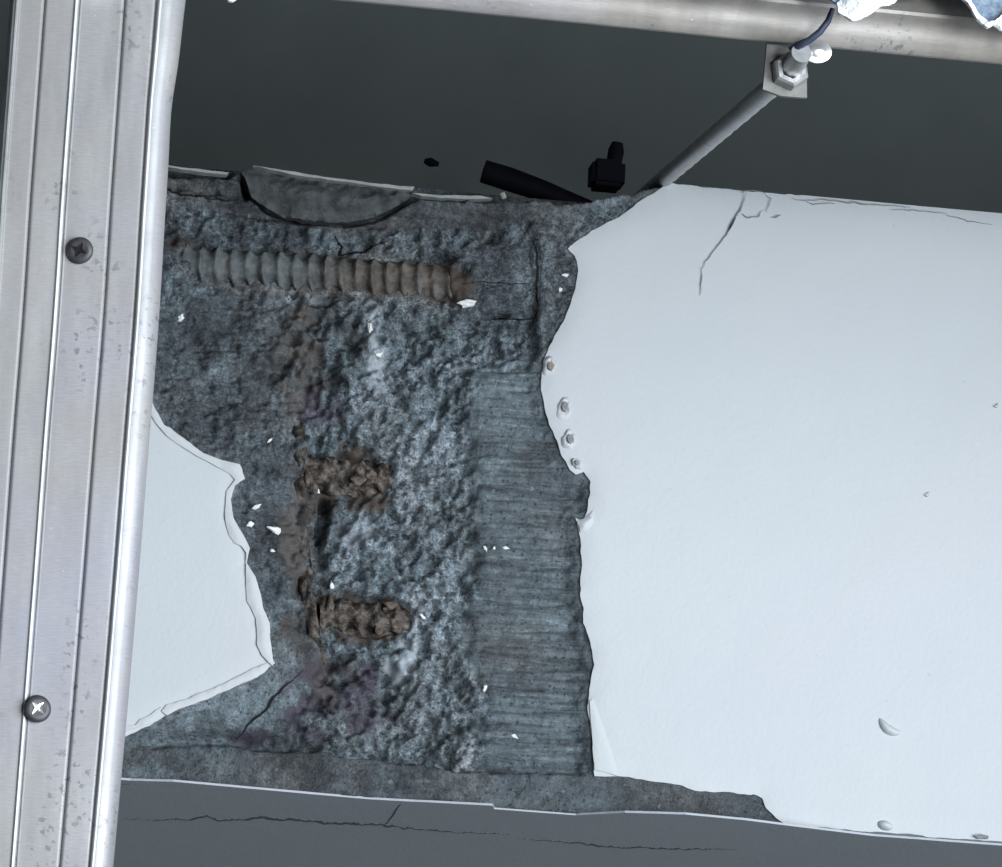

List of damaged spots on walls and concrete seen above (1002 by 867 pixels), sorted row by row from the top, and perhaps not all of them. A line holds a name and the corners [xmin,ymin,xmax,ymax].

crack [167,189,397,257]
crack [700,190,992,295]
corrosion [312,469,387,516]
spalling [121,165,782,823]
corrosion [317,592,403,645]
crack [234,670,304,743]
crack [126,806,737,850]